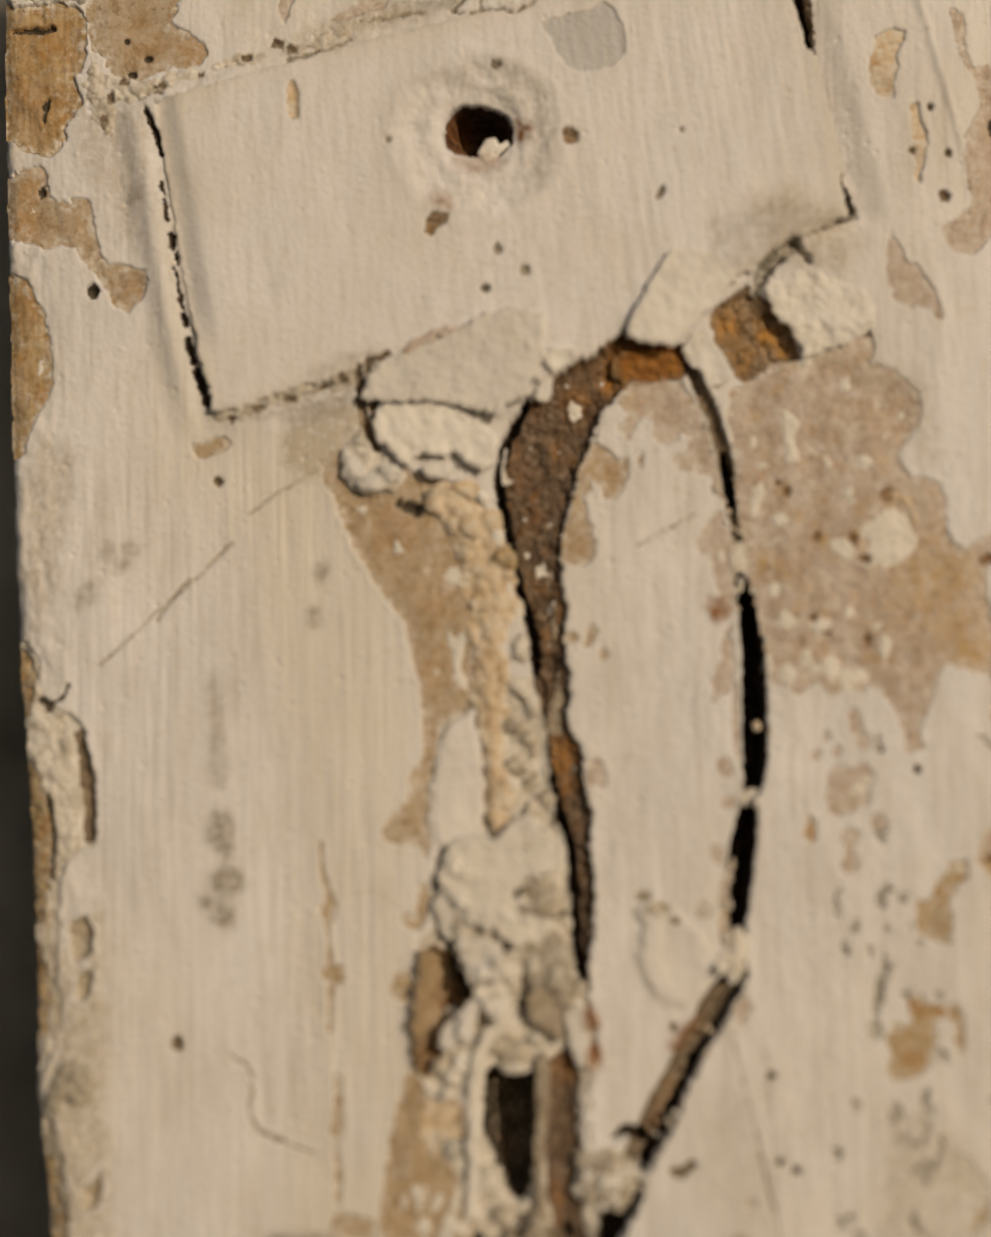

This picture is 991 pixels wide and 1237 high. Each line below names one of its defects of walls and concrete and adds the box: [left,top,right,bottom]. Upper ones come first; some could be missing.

peeling [9,275,54,460]
peeling [5,0,388,313]
peeling [424,210,448,235]
peeling [559,442,643,566]
peeling [617,238,991,777]
peeling [942,9,991,254]
spalling [20,642,98,1070]
spalling [192,306,601,1237]
crack [587,361,774,1237]
peeling [876,829,991,947]
spalling [42,1114,102,1237]
peeling [865,945,990,1237]